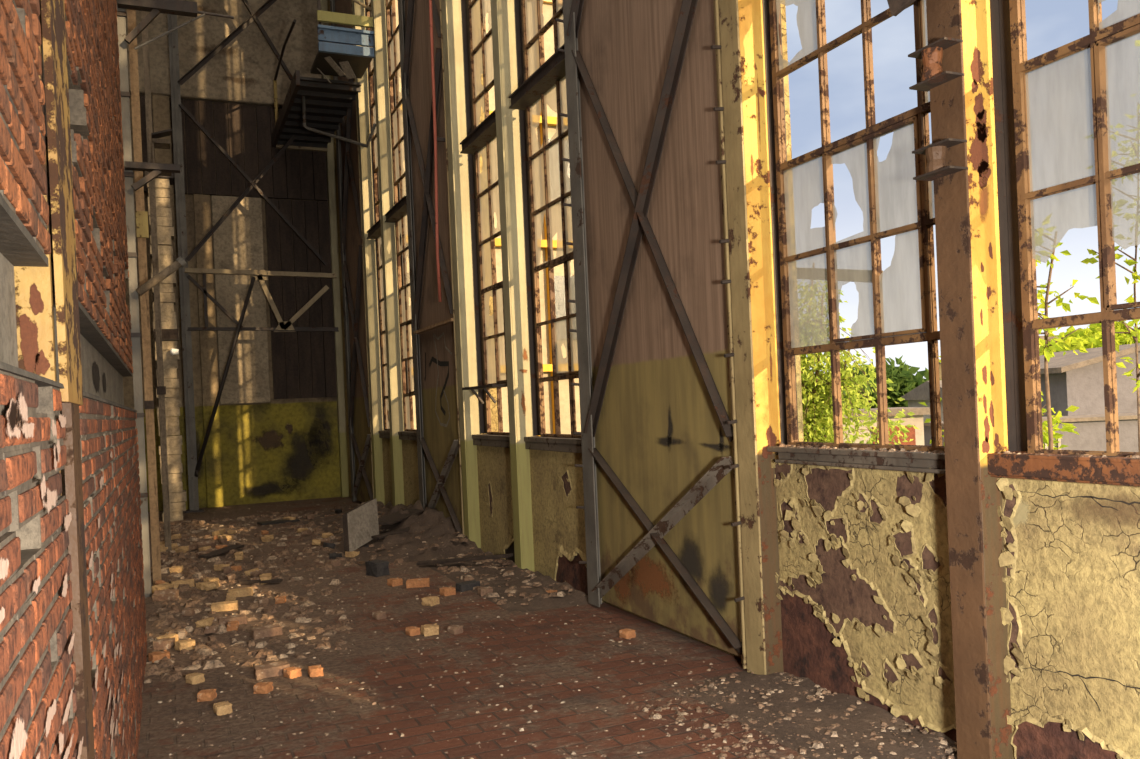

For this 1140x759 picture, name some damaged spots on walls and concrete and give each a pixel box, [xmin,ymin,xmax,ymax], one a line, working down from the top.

corrosion [969,47,991,219]
leakage [246,408,332,497]
flaking render [771,460,957,742]
crack [1015,666,1140,712]
flaking render [1007,715,1130,759]